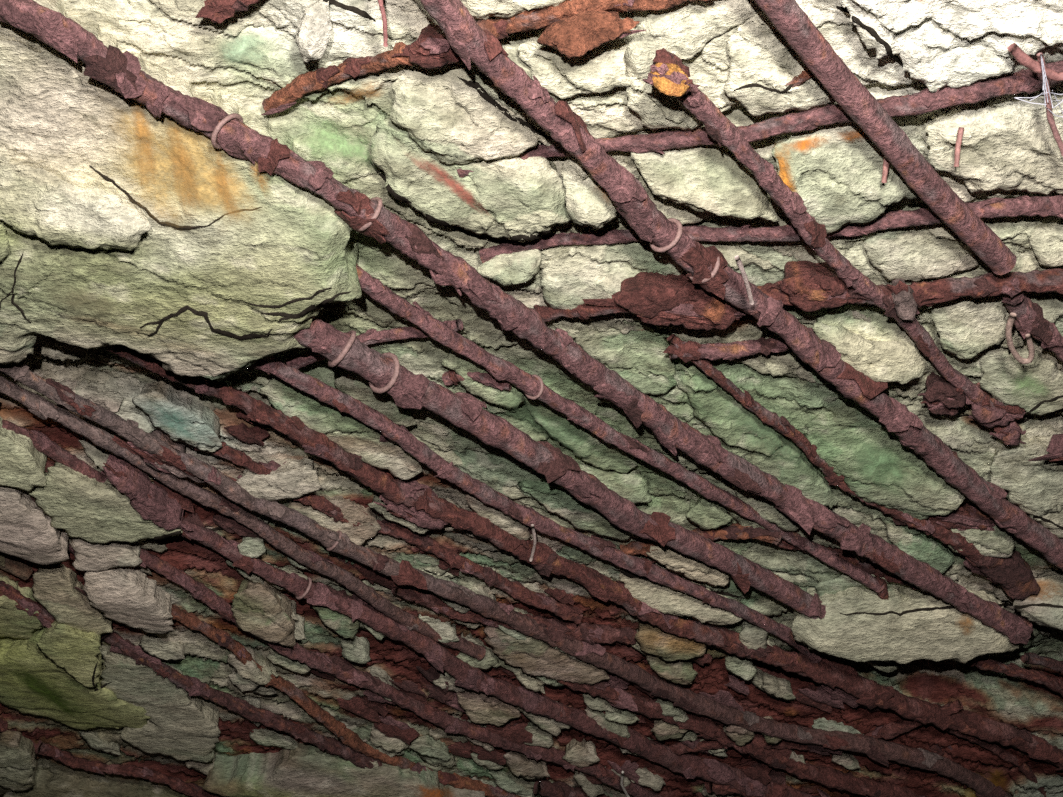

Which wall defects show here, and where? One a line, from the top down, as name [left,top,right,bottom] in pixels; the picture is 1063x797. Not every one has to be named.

crack [90,166,261,230]
crack [0,251,31,323]
crack [140,287,352,341]
corrosion [0,0,1034,644]
peeling [369,64,1015,574]
peeling [931,296,1063,416]
peeling [259,369,423,480]
corrosion [0,264,1063,797]
peeling [990,437,1063,539]
peeling [0,417,666,797]
peeling [618,539,796,701]
peeling [791,573,1019,673]